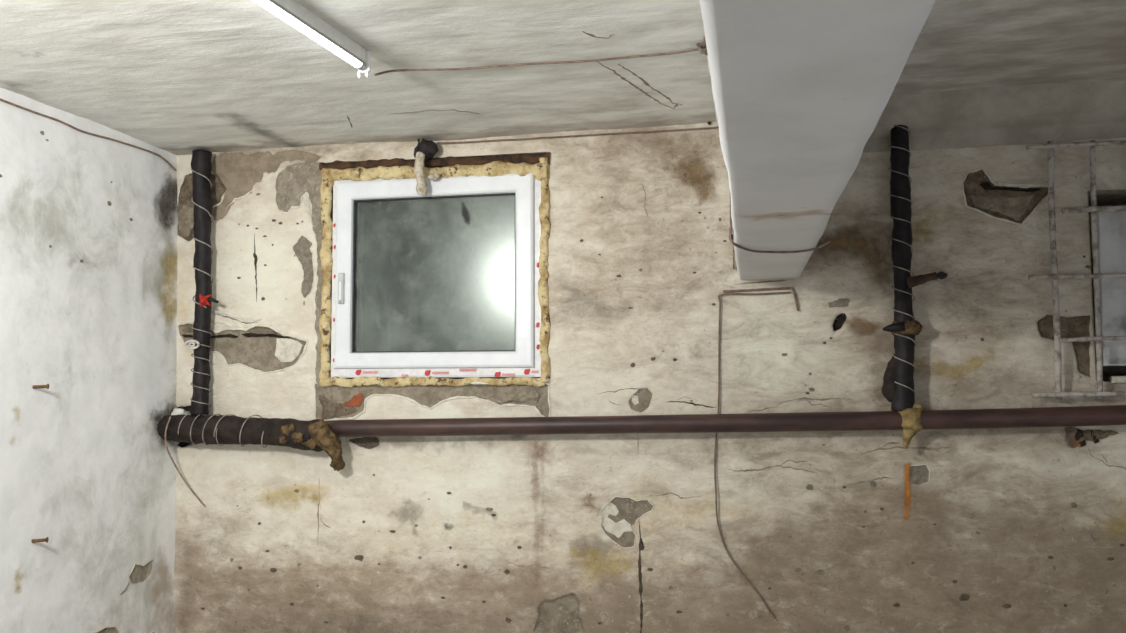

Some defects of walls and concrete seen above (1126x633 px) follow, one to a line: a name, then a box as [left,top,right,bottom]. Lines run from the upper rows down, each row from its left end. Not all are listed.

crack [583,31,681,109]
damp [159,179,178,227]
spalling [177,173,194,241]
damp [677,155,713,199]
spalling [963,168,1048,225]
crack [251,233,259,302]
spalling [210,150,551,421]
spalling [178,323,194,352]
spalling [1038,315,1090,377]
peeling [599,496,654,548]
crack [637,523,645,633]
spalling [534,594,584,633]